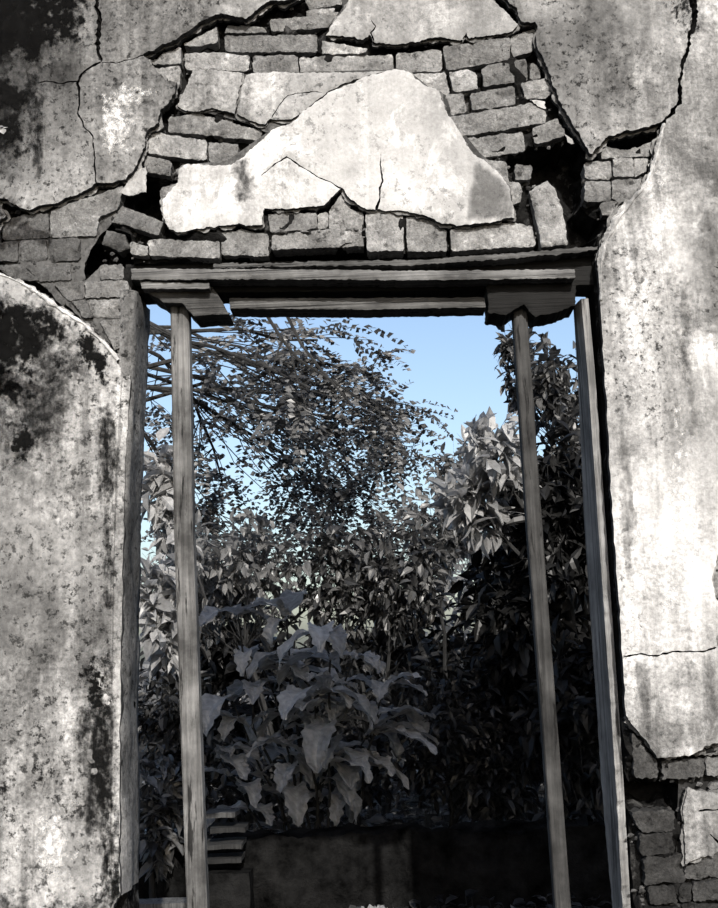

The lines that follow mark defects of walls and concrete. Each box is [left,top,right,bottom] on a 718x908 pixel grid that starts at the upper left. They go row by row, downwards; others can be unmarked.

leakage [0,0,88,176]
crack [40,0,145,185]
flaking render [0,0,574,361]
crack [262,156,342,190]
crack [375,159,383,212]
flaking render [580,123,666,300]
crack [660,0,698,128]
leakage [0,297,114,462]
leakage [98,406,119,608]
flaking render [625,724,718,908]